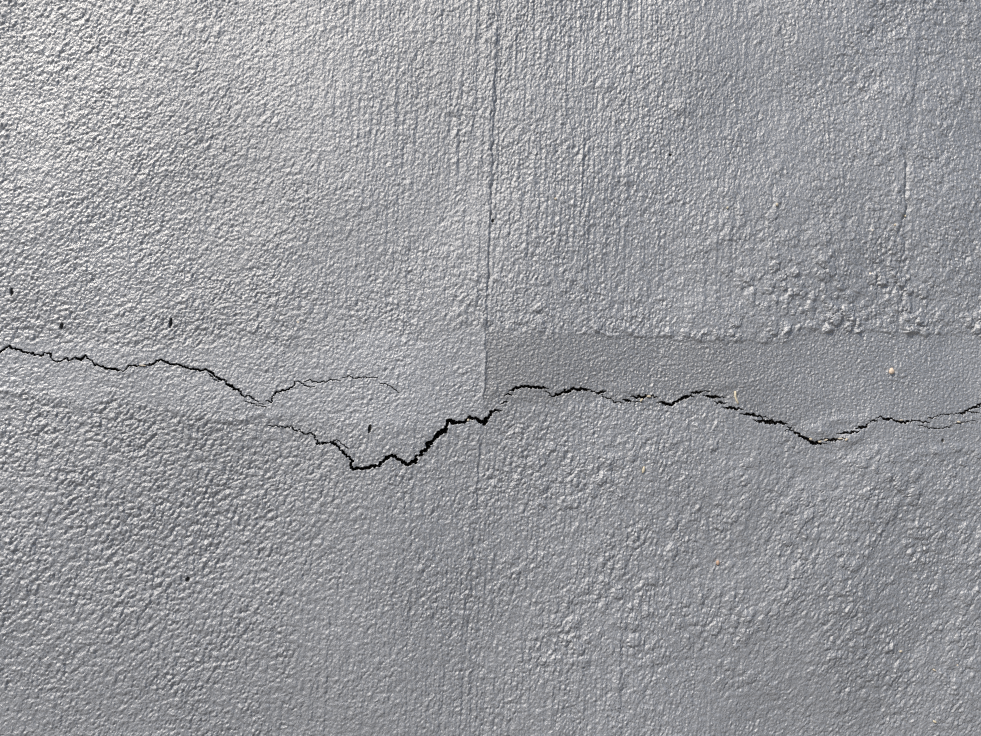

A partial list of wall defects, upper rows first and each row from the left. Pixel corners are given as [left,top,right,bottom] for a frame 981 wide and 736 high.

crack [0,345,981,470]